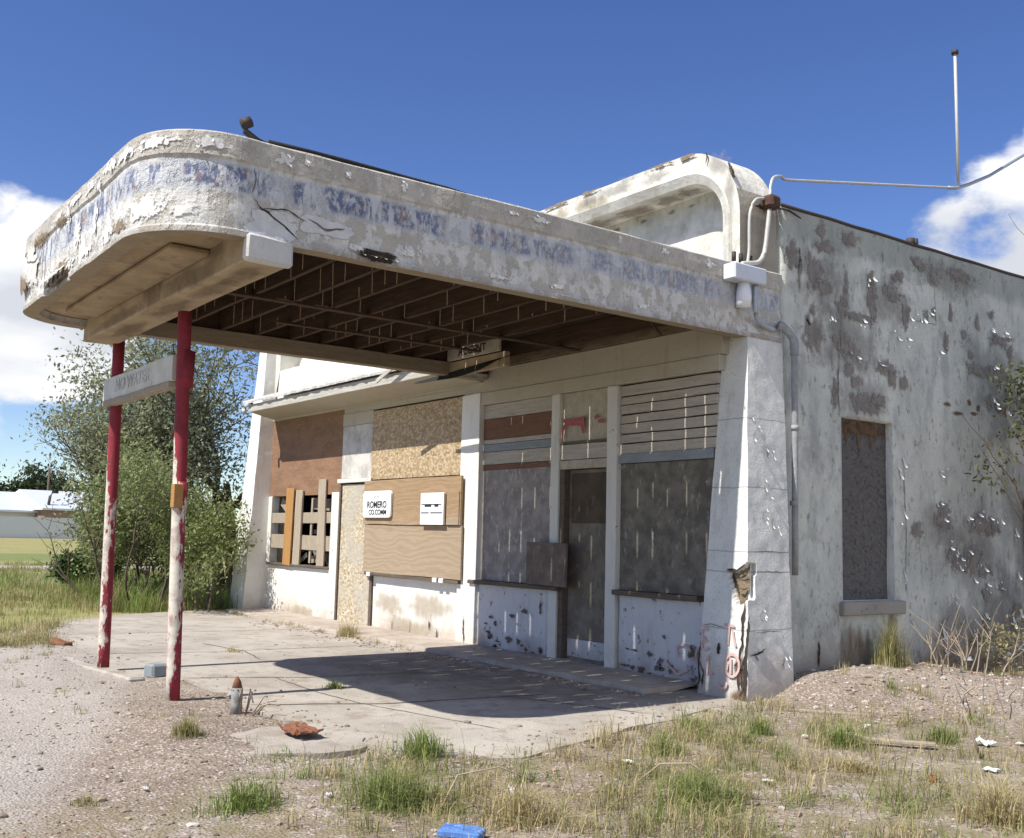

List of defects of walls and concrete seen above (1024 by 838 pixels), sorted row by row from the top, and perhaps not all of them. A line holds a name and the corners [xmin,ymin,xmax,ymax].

peeling [34,134,235,290]
crack [252,169,344,240]
peeling [243,208,422,265]
peeling [508,199,567,225]
peeling [910,255,976,287]
peeling [783,219,953,417]
peeling [962,310,1014,418]
rust [841,420,881,451]
peeling [901,501,1020,667]
peeling [484,615,542,654]
peeling [619,647,673,674]
crack [696,602,781,702]